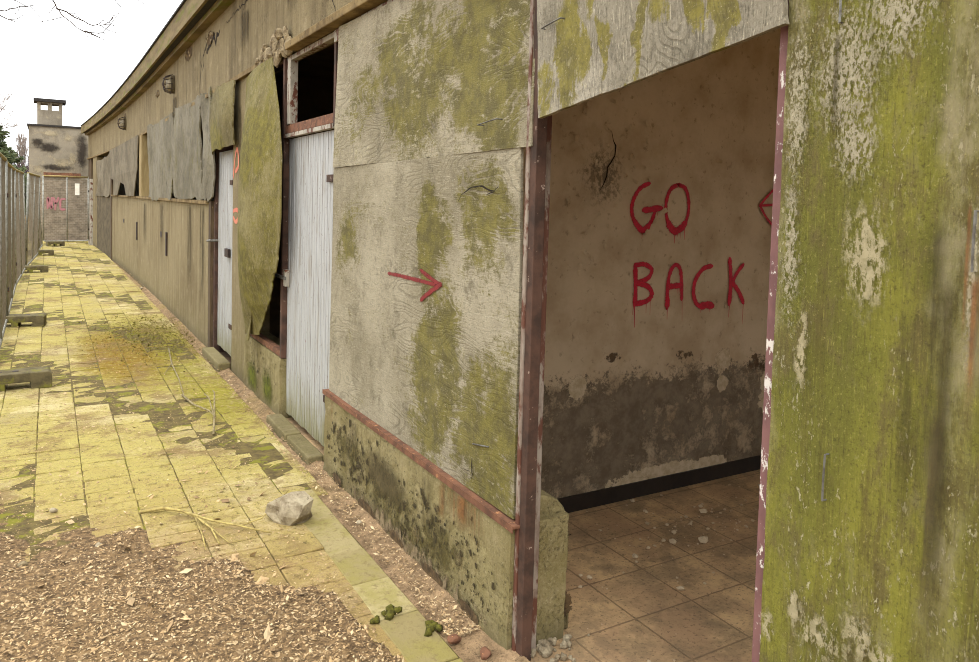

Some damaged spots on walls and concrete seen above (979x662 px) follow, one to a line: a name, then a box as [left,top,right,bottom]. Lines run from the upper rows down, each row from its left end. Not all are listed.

peeling [786,0,937,178]
crack [600,134,616,190]
peeling [782,192,798,314]
peeling [845,211,886,303]
peeling [795,312,807,378]
water stain [921,236,951,594]
spalling [327,412,495,626]
peeling [788,592,891,662]